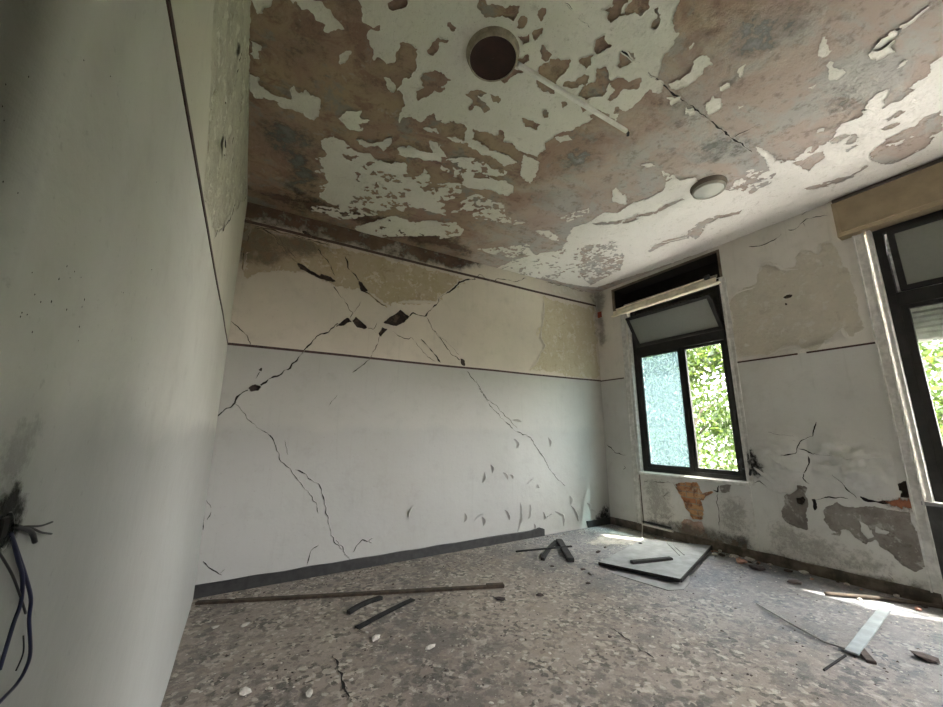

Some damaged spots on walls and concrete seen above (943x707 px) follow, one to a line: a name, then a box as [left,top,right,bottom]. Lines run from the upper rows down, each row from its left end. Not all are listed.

crack [621,50,760,152]
leakage [240,122,480,269]
peeling [204,0,943,305]
peeling [243,224,465,336]
crack [218,201,587,565]
flaking render [675,482,731,535]
crack [768,422,890,506]
flaking render [781,485,925,572]
flaking render [898,481,909,498]